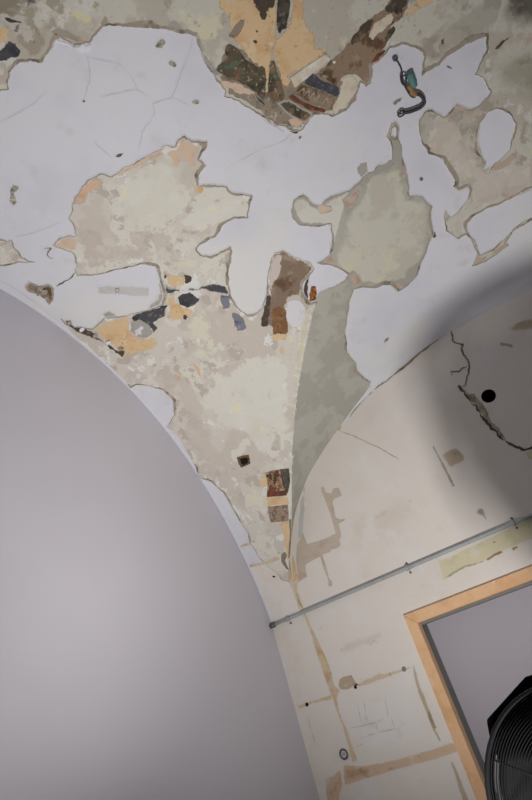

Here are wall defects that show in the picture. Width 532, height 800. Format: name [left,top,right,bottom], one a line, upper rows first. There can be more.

crack [84,39,193,150]
peeling [0,0,532,582]
crack [339,331,532,461]